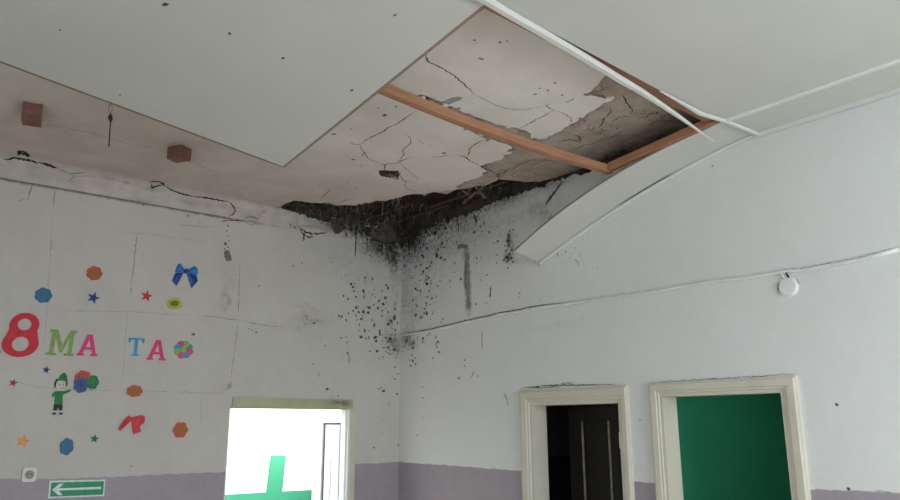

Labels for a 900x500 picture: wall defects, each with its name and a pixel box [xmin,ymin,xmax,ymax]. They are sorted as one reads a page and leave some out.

crack [4,151,84,205]
crack [151,181,266,225]
crack [352,111,418,192]
flaking render [281,76,701,249]
crack [425,54,655,182]
damp [338,210,550,380]